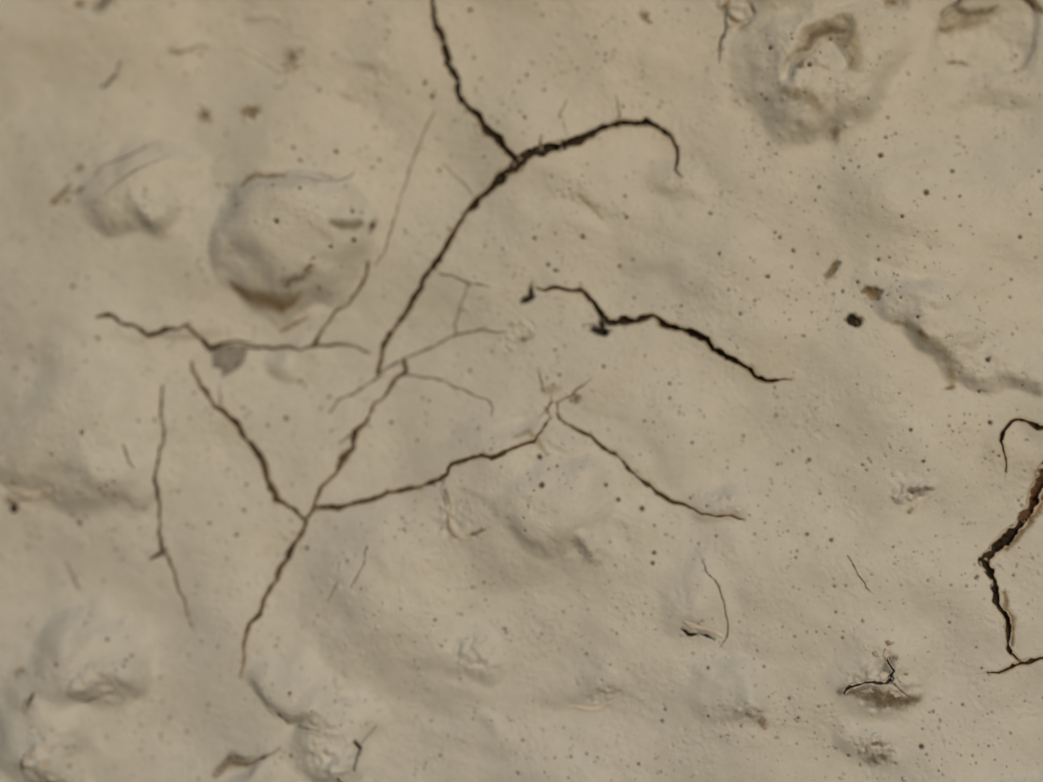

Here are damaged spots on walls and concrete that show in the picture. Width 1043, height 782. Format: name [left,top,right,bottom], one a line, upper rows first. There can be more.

spalling [210,345,247,377]
crack [95,0,744,782]
crack [536,284,791,384]
crack [998,417,1043,472]
crack [979,464,1043,675]